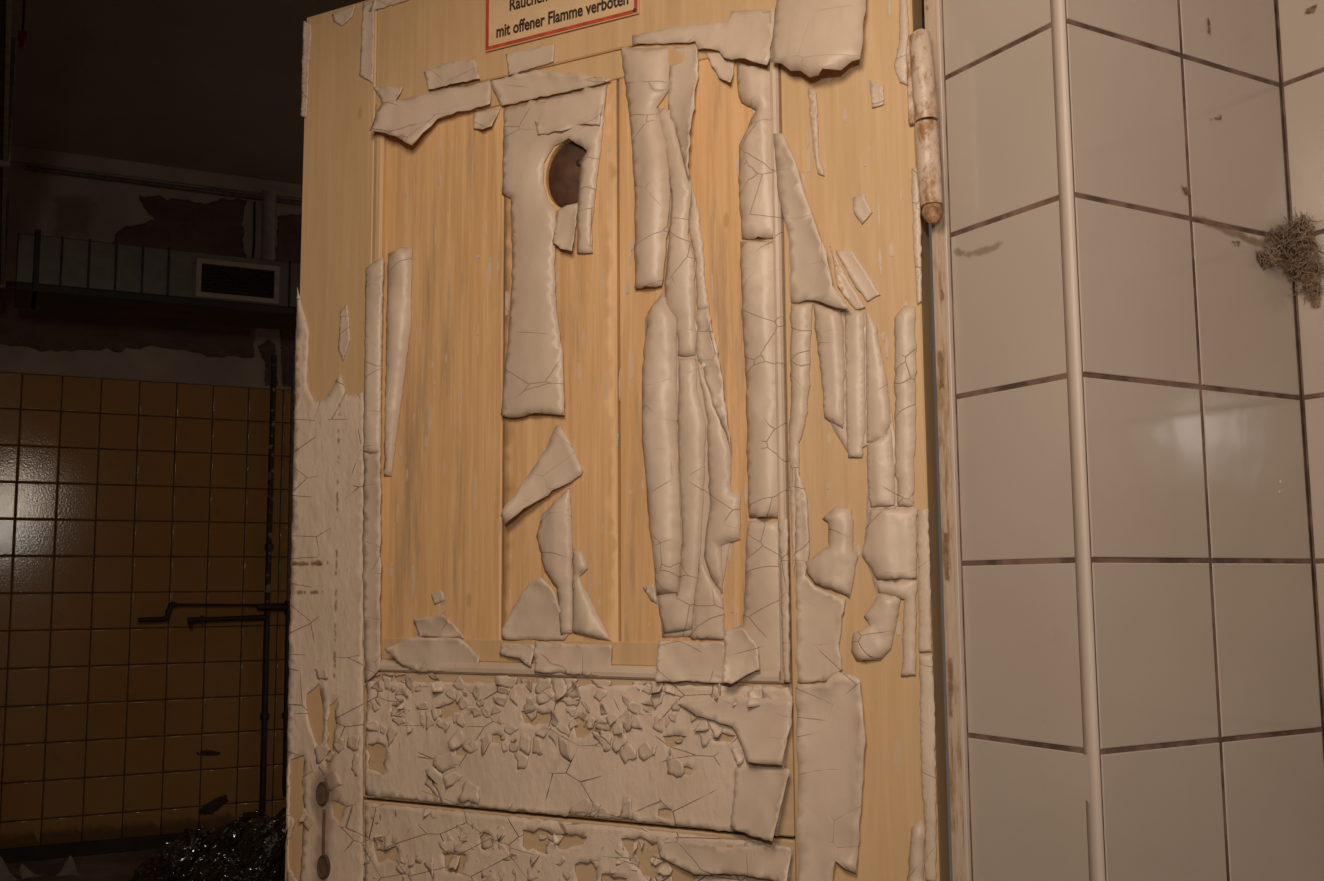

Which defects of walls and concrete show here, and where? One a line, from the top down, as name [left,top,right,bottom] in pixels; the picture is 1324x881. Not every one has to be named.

peeling [113,195,247,257]
peeling [276,214,302,263]
peeling [0,281,296,387]
peeling [314,0,953,881]